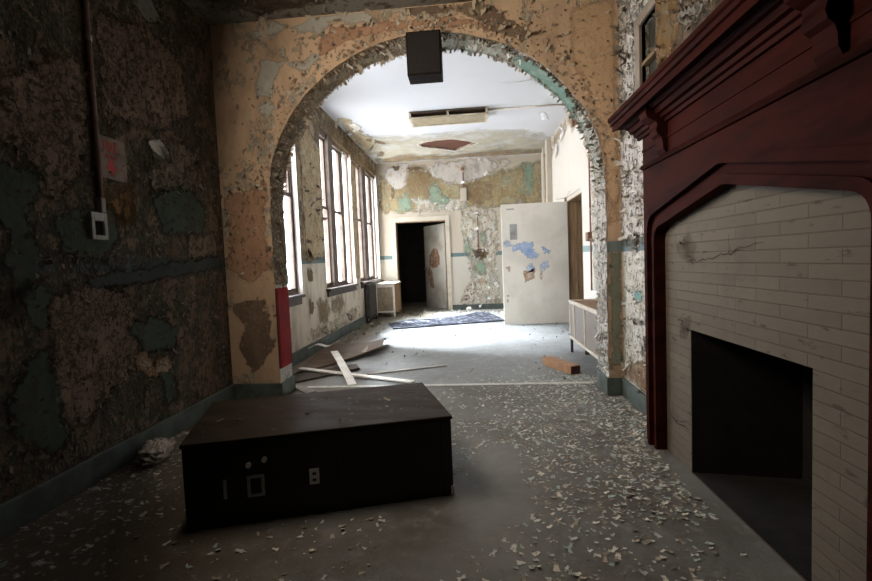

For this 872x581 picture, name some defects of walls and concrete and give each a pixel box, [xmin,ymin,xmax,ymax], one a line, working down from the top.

peeling [655,0,713,58]
flaking render [0,0,205,203]
peeling [186,0,646,394]
leakage [332,119,569,214]
crack [688,237,763,262]